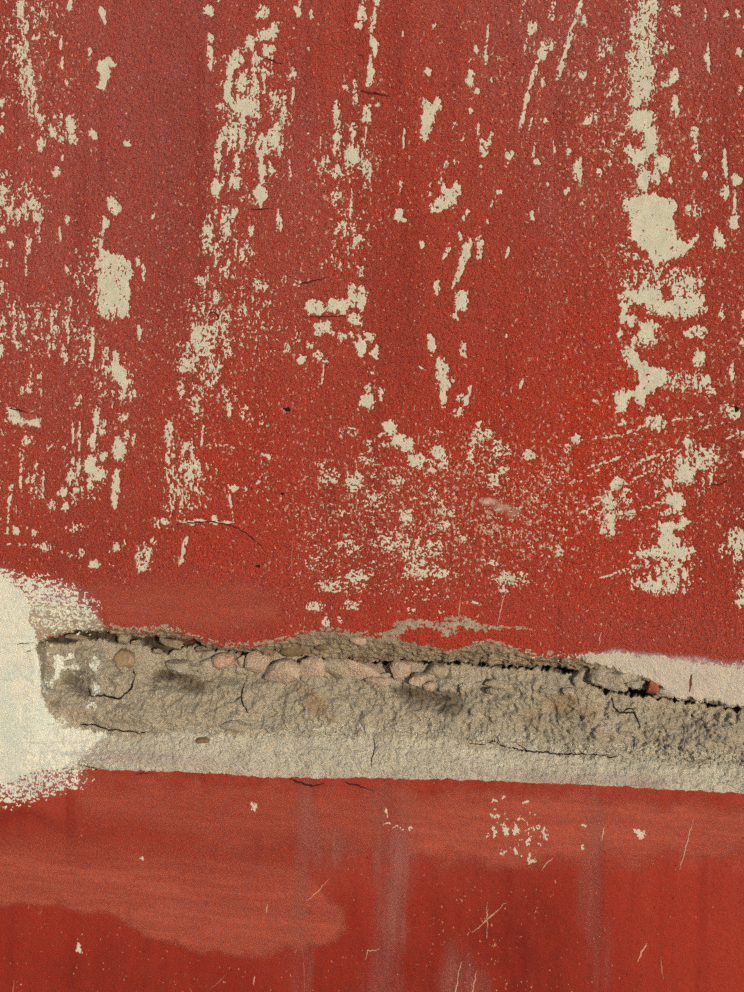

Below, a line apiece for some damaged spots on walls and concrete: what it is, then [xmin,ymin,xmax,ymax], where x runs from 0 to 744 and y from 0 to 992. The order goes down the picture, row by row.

peeling [712,148,743,250]
peeling [0,0,389,573]
peeling [293,0,728,610]
peeling [703,401,741,430]
peeling [717,508,744,609]
crack [17,630,217,653]
spalling [0,568,744,803]
crack [604,687,647,729]
peeling [486,795,549,865]